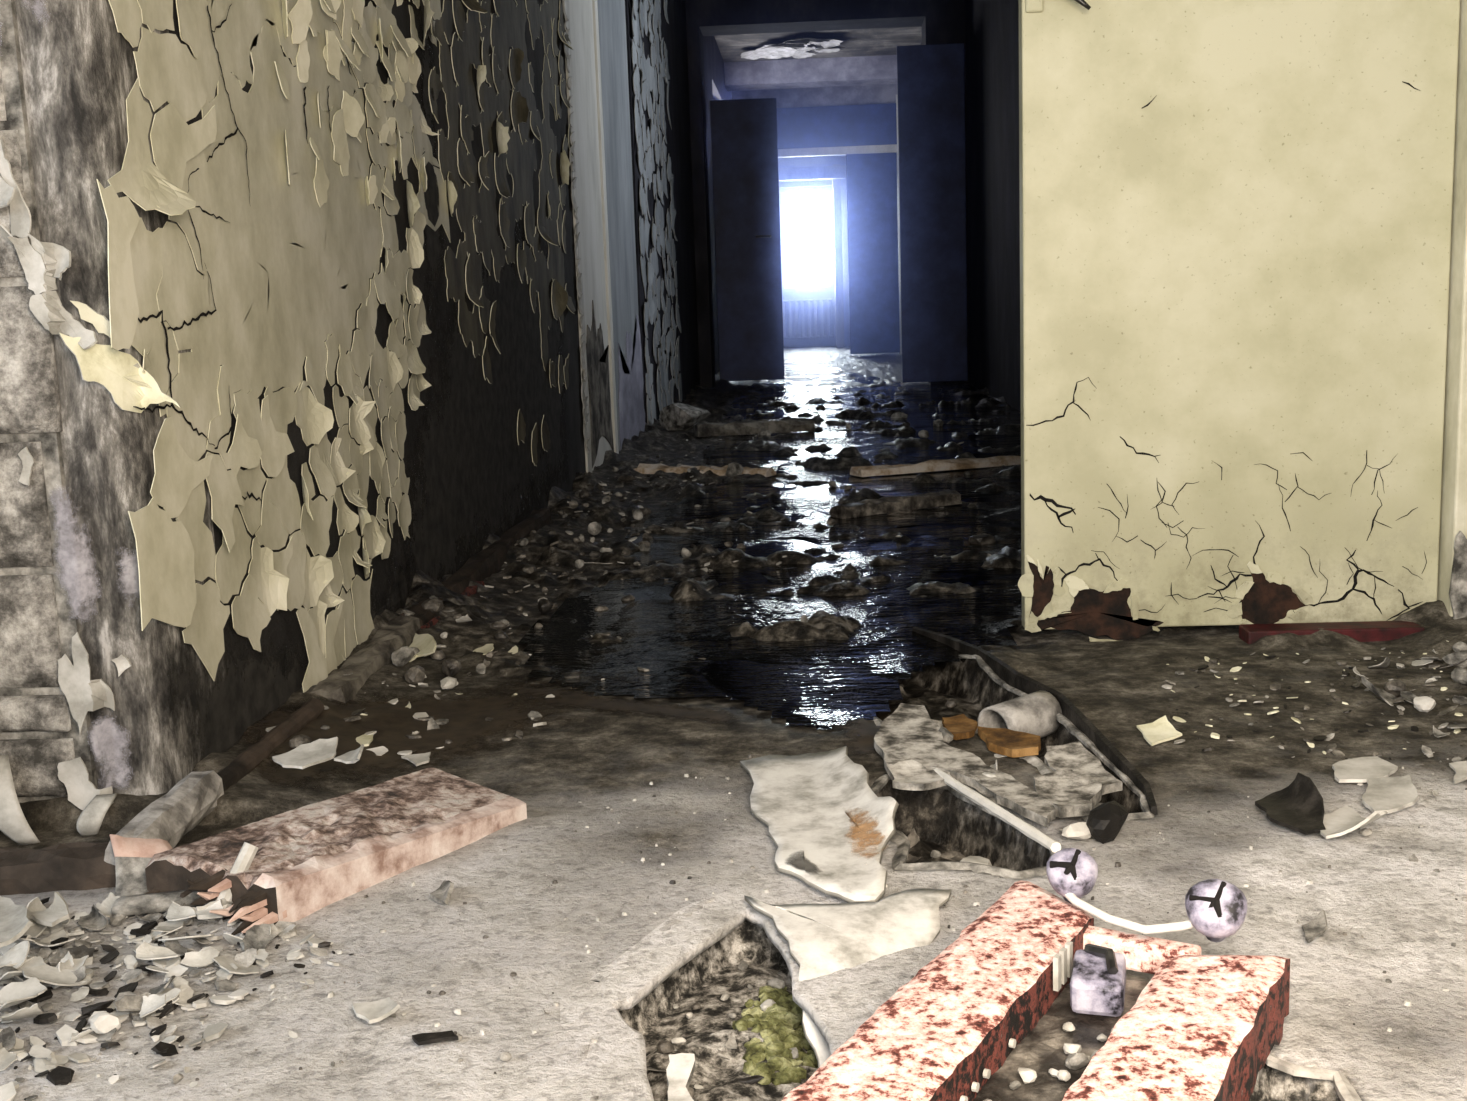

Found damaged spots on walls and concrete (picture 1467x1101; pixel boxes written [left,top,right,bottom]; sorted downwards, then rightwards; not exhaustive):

crack [133,4,250,449]
peeling [0,0,682,693]
peeling [57,757,114,810]
peeling [58,632,131,735]
crack [1026,377,1427,621]
spalling [1449,531,1467,620]